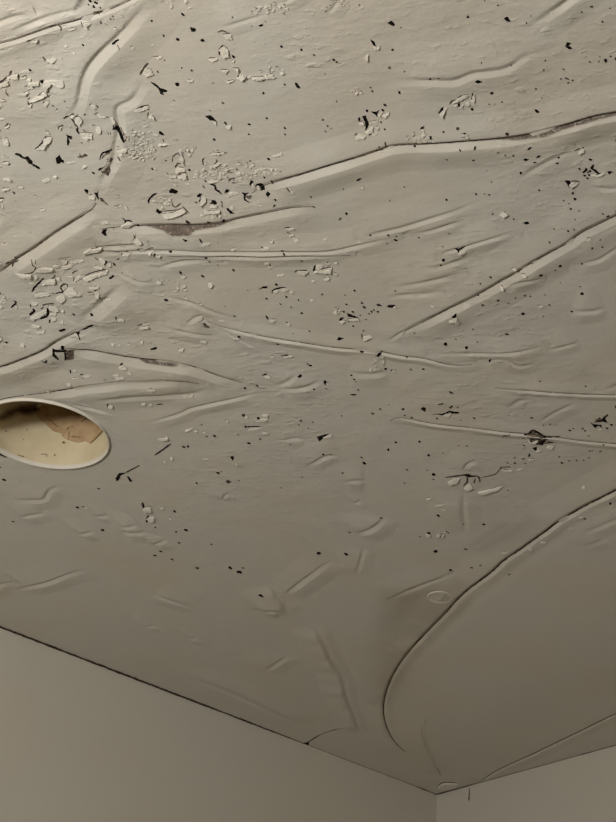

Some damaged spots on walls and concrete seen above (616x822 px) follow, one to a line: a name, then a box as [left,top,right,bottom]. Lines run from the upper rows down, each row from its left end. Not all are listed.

peeling [0,69,282,223]
peeling [140,56,167,95]
peeling [208,30,285,84]
peeling [355,104,389,140]
peeling [0,189,171,334]
crack [0,418,616,801]